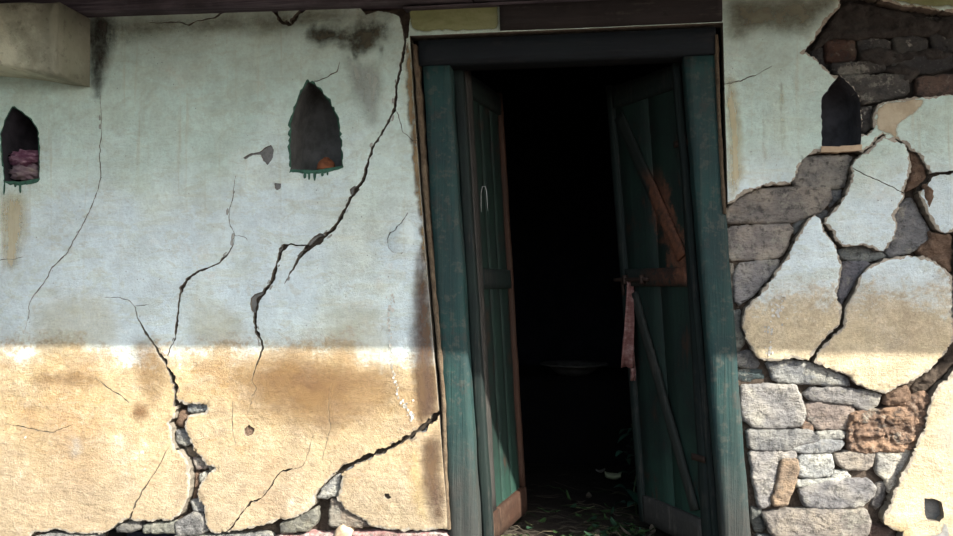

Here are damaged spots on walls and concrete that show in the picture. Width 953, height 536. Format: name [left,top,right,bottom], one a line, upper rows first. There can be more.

water stain [308,23,386,52]
crack [25,97,102,329]
crack [105,176,247,407]
flaking render [244,145,274,165]
crack [232,41,420,445]
flaking render [726,0,953,536]
crack [853,168,953,194]
water stain [242,366,386,421]
crack [129,449,168,520]
flaking render [35,404,379,536]
crack [226,389,442,532]
water stain [423,439,442,517]